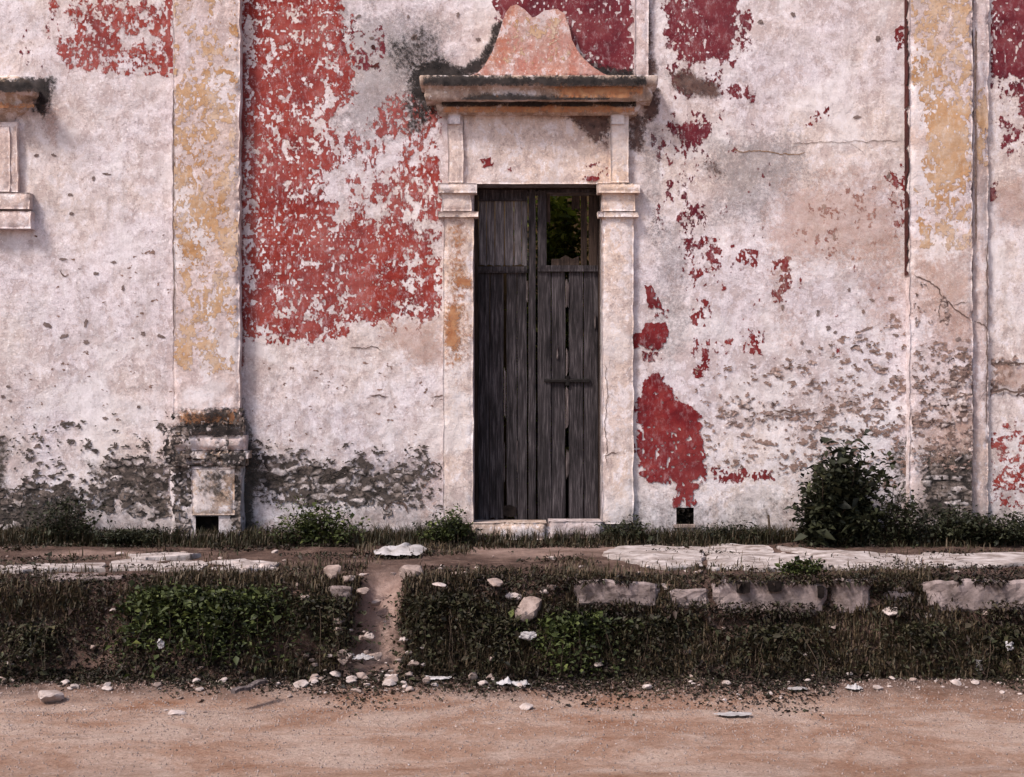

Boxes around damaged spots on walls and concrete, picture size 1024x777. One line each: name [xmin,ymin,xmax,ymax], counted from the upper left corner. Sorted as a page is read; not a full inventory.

peeling [45,0,442,375]
leakage [388,5,722,152]
peeling [633,0,973,528]
crack [732,140,898,155]
peeling [794,0,1024,260]
crack [913,28,1024,427]
leakage [166,398,245,437]
spalling [0,389,443,542]